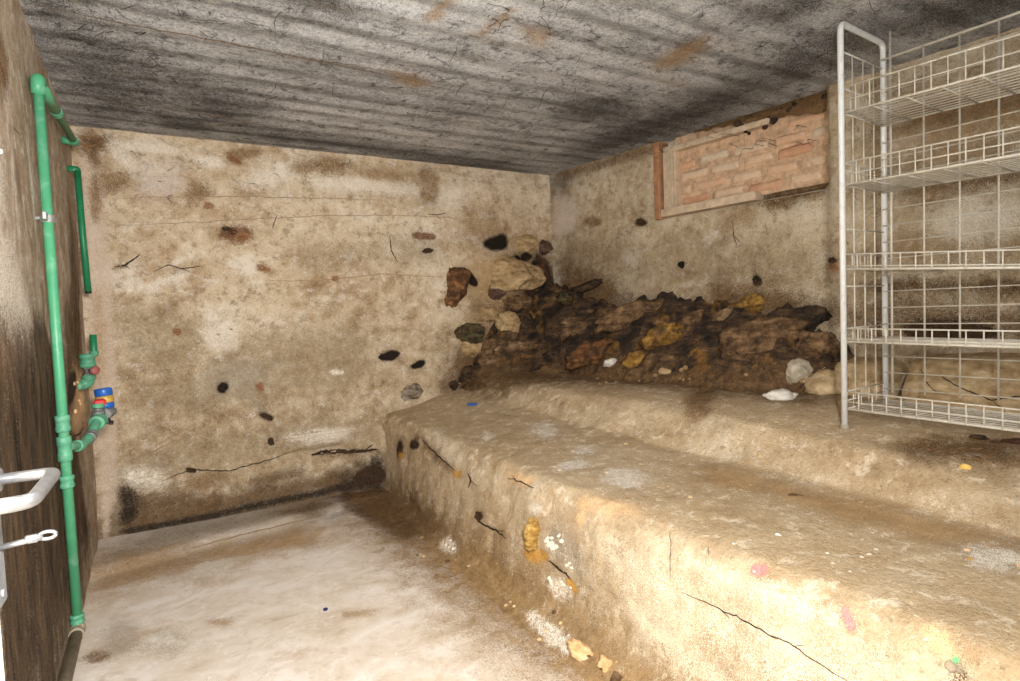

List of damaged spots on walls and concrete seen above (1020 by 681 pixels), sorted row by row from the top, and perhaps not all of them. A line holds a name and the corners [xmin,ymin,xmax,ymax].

leakage [0,28,13,107]
leakage [23,0,1020,363]
leakage [0,129,419,681]
crack [311,444,378,460]
crack [420,435,477,488]
crack [474,511,505,538]
crack [603,540,847,681]